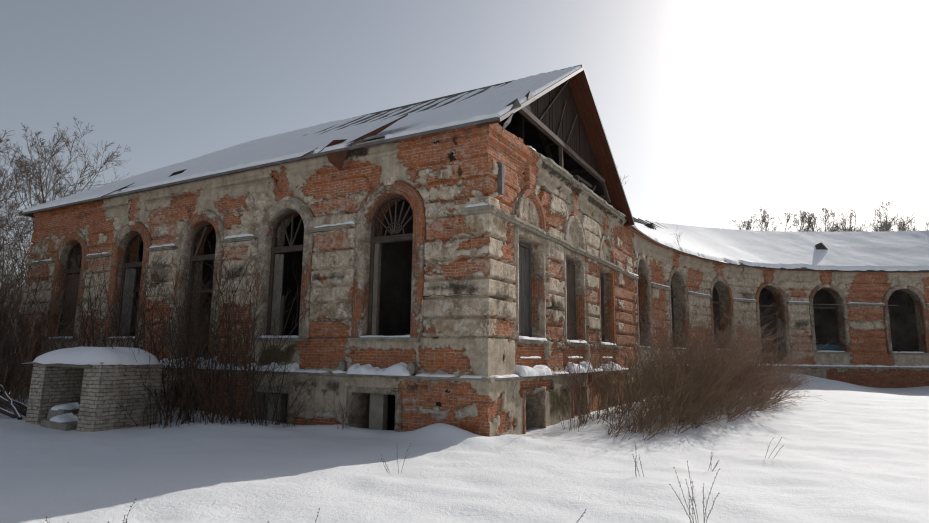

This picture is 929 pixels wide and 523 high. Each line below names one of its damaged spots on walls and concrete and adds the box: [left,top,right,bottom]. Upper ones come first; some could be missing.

flaking render [27,200,116,285]
flaking render [213,195,248,230]
flaking render [268,160,382,216]
flaking render [392,123,578,280]
flaking render [286,414,342,425]
flaking render [296,316,516,437]
flaking render [490,210,637,412]
flaking render [649,252,704,350]
flaking render [827,272,929,388]